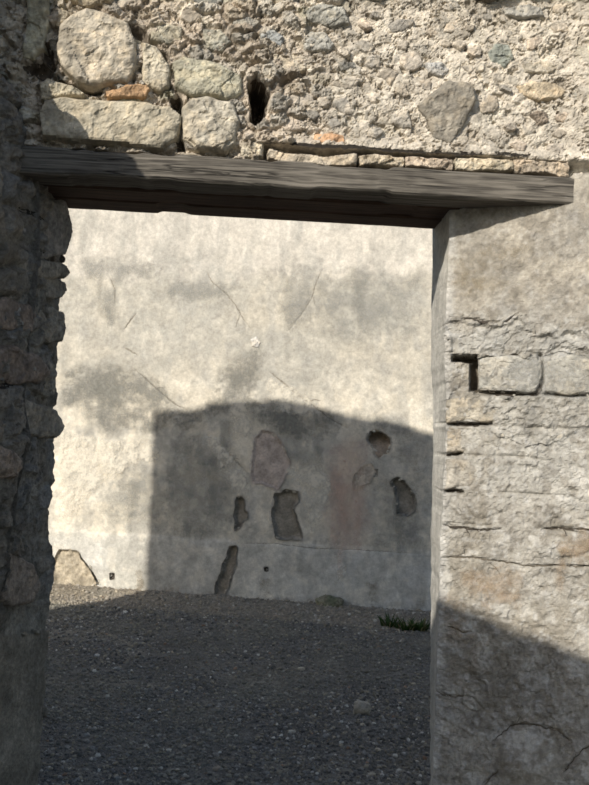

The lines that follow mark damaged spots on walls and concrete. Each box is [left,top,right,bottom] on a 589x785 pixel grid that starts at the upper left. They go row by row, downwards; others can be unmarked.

flaking render [232,495,250,533]
flaking render [249,427,304,541]
spalling [352,428,393,491]
flaking render [389,476,418,517]
flaking render [54,549,99,586]
flaking render [214,543,238,595]
crack [495,716,589,772]